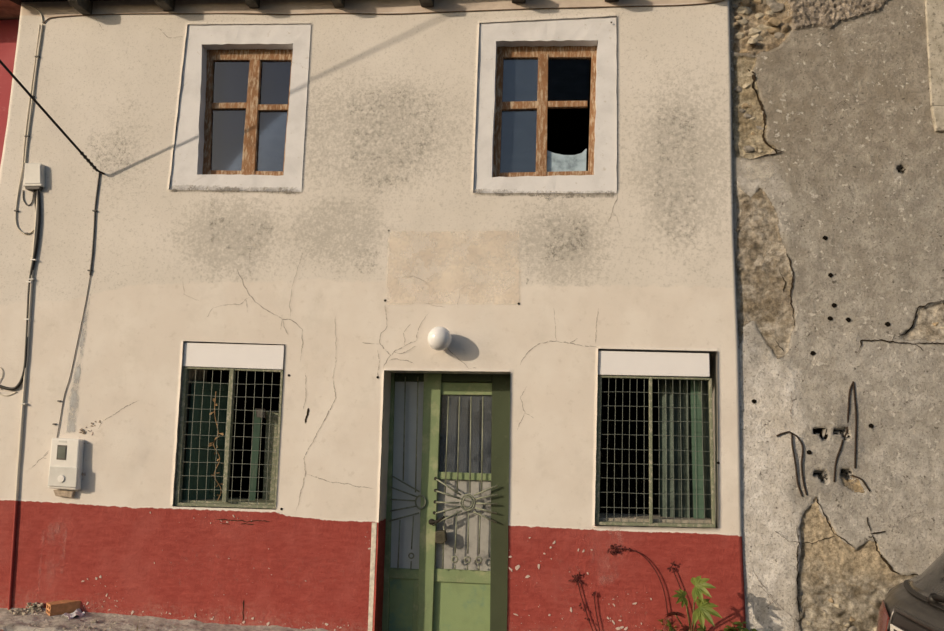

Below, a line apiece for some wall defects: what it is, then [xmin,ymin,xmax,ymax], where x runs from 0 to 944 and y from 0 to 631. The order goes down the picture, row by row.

spalling [731,0,887,159]
crack [183,256,306,409]
crack [521,312,598,362]
spalling [734,182,795,359]
spalling [901,303,944,342]
crack [298,368,366,505]
spalling [813,427,850,440]
spalling [840,469,864,493]
spalling [798,497,915,631]